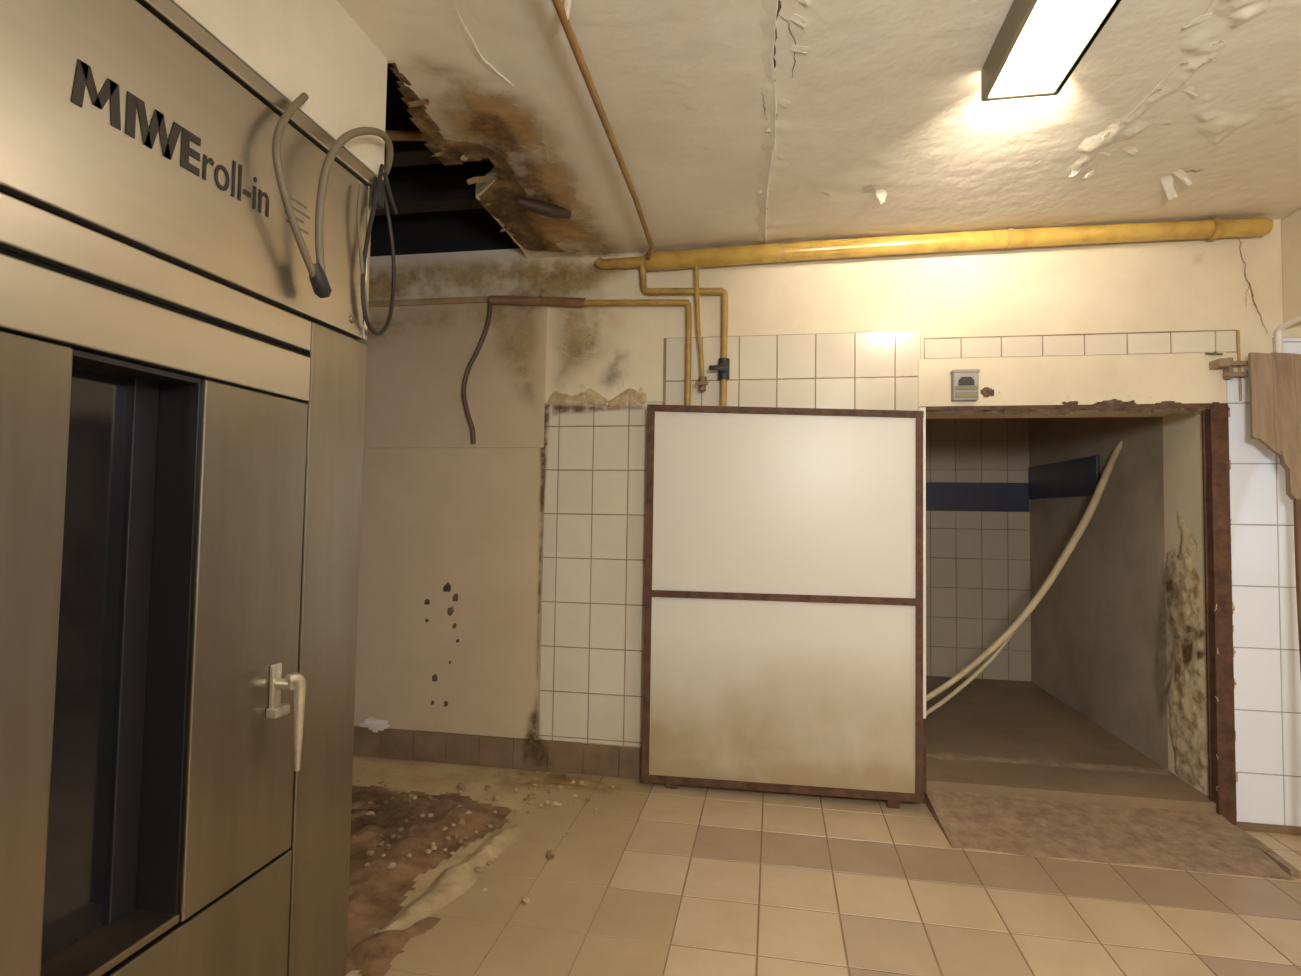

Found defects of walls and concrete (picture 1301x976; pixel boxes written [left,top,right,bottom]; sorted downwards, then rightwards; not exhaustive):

spalling [390,63,565,253]
water stain [369,6,616,297]
crack [755,0,809,244]
peeling [1065,0,1274,179]
peeling [1160,169,1203,200]
crack [1238,239,1268,334]